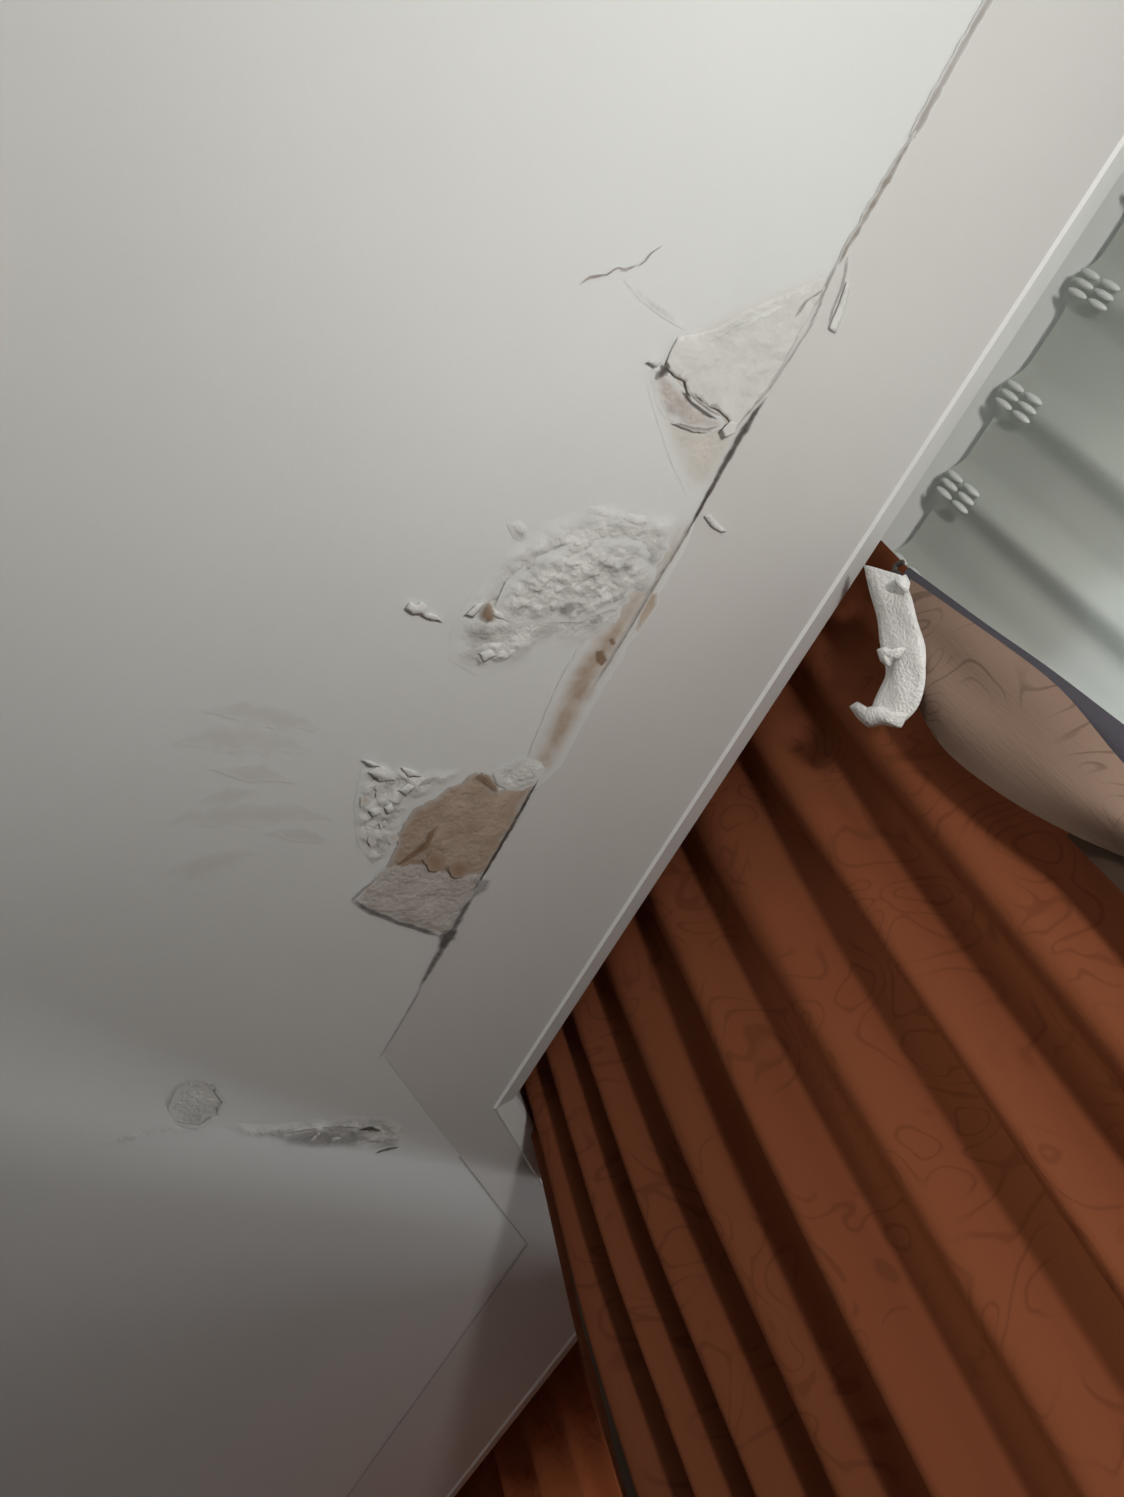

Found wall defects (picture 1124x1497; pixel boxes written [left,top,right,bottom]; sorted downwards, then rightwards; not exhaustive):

peeling [646,267,851,493]
crack [579,0,994,689]
water stain [528,500,703,788]
peeling [353,758,546,937]
crack [476,786,535,887]
crack [378,984,424,1061]